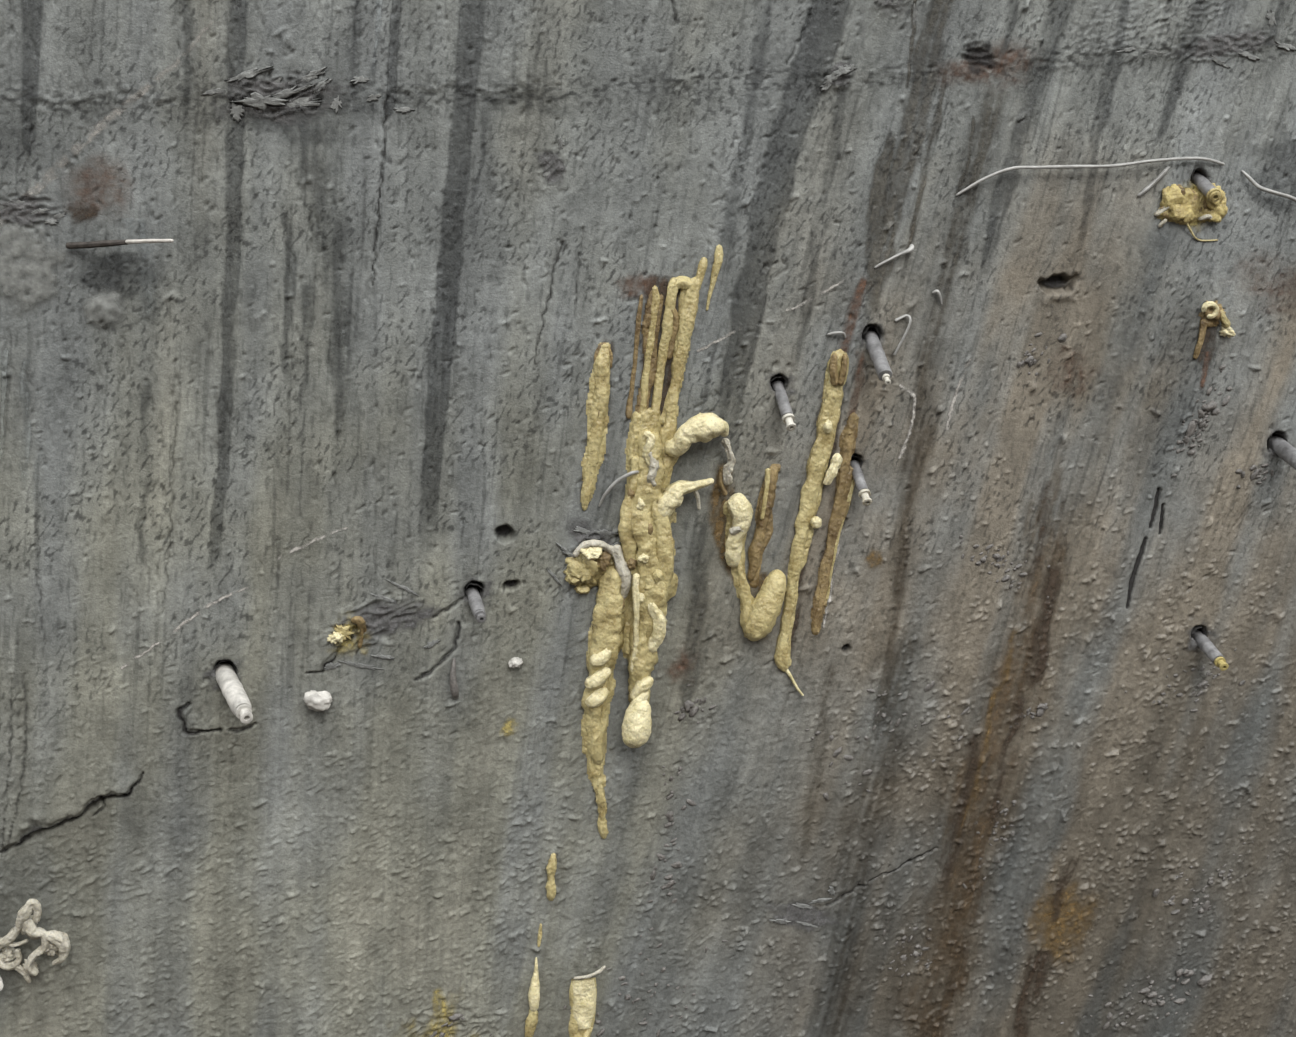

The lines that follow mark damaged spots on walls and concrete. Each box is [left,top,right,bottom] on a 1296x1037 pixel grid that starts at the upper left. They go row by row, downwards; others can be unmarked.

spalling [201,66,342,123]
damp [422,0,551,518]
crack [1,777,142,852]
rust [912,485,1065,1037]
rust [1015,860,1096,1037]